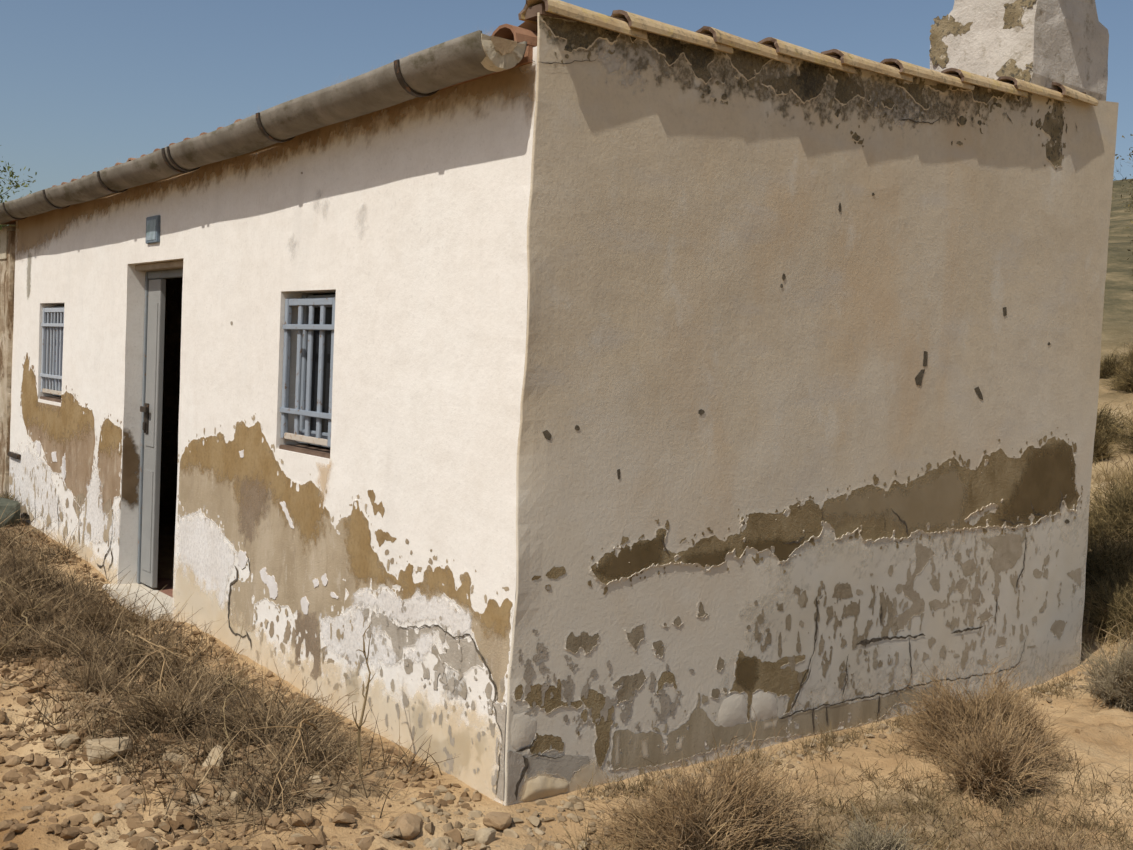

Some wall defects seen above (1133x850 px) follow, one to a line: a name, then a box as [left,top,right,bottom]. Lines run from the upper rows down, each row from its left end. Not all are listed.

spalling [539,16,1068,170]
leakage [16,67,536,297]
peeling [9,352,123,547]
crack [228,556,251,646]
crack [397,624,564,800]
peeling [177,413,1090,804]
crack [780,596,1027,734]
crack [953,491,1063,633]